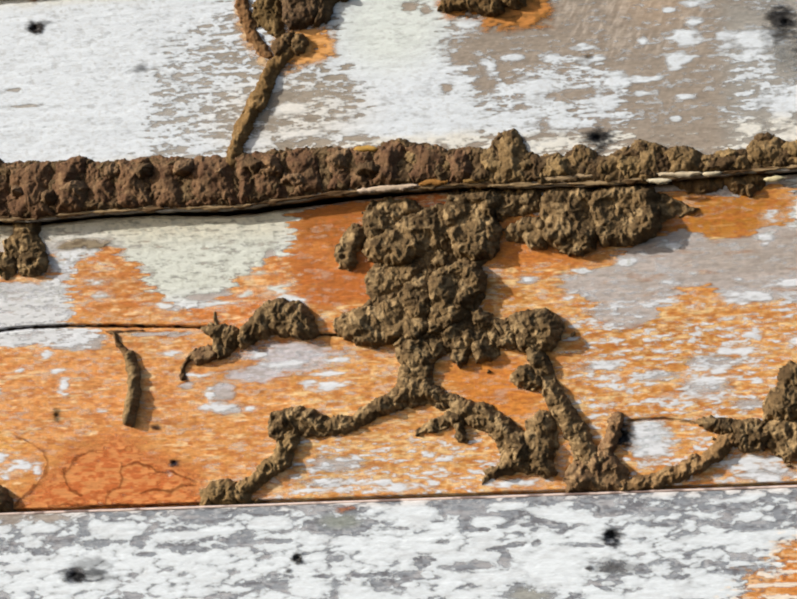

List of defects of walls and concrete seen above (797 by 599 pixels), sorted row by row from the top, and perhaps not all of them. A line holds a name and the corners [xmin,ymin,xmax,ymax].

peeling [0,0,276,163]
peeling [243,0,797,156]
peeling [393,194,447,208]
peeling [655,177,797,250]
crack [0,324,201,333]
peeling [0,200,797,599]